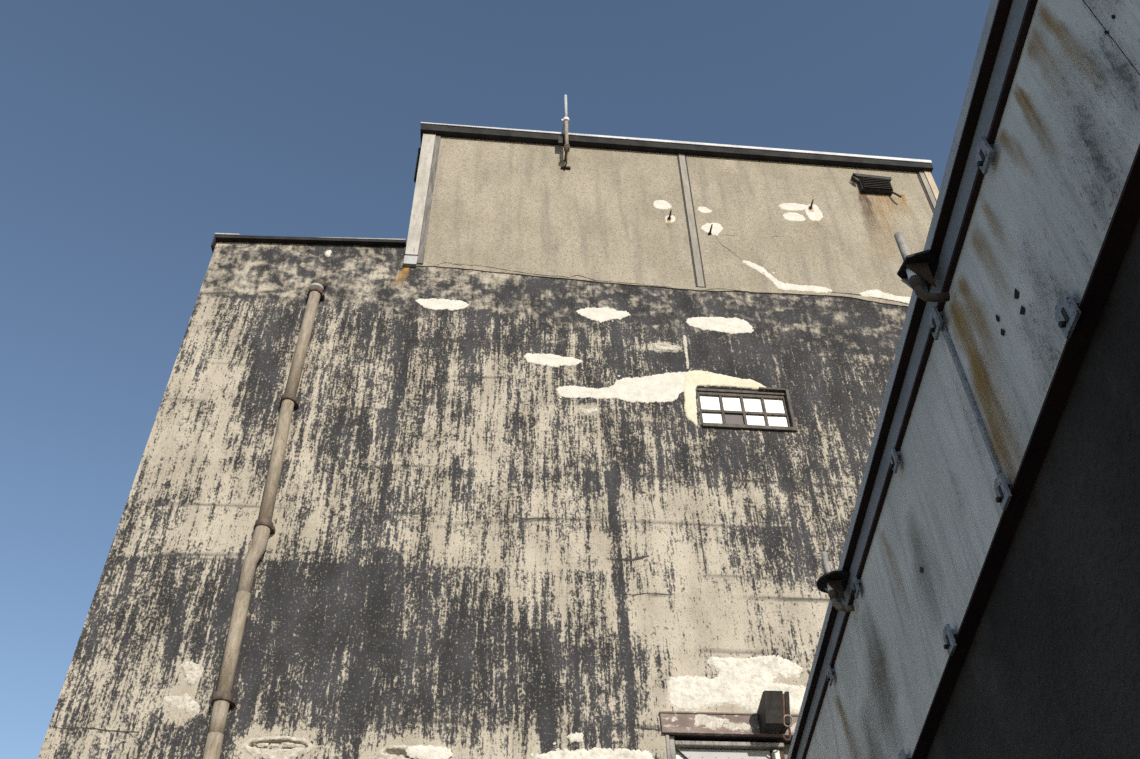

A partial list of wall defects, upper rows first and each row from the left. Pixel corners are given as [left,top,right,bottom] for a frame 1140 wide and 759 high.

corrosion [1016,90,1039,125]
corrosion [950,280,1006,465]
spalling [579,407,599,416]
spalling [240,736,321,759]
spalling [376,744,453,759]